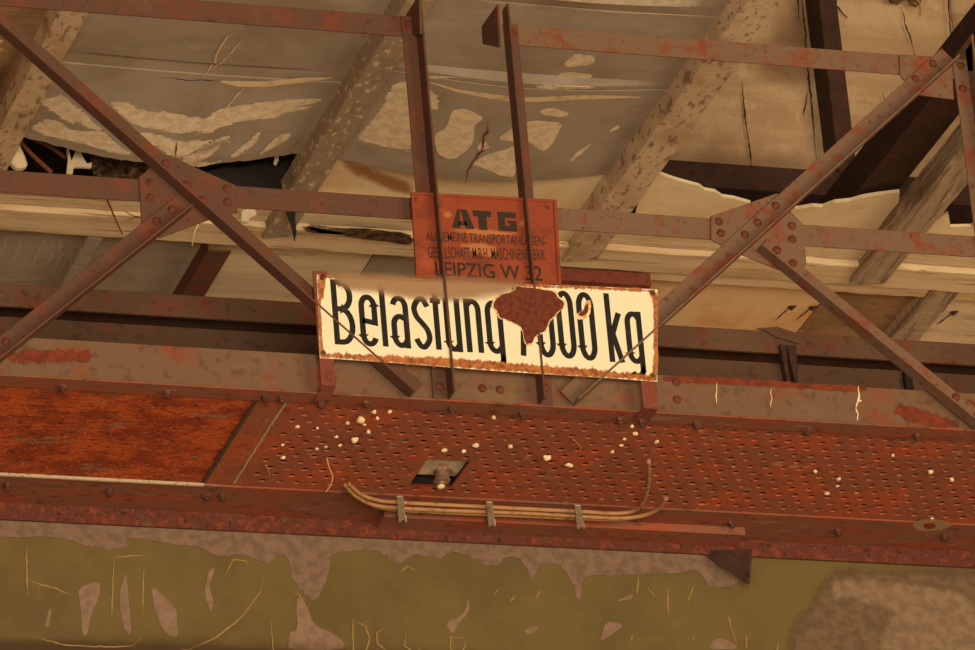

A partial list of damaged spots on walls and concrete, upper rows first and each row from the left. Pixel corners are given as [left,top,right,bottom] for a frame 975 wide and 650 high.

peeling [32,94,134,175]
peeling [111,98,322,167]
peeling [358,80,412,152]
peeling [430,91,440,110]
peeling [434,108,516,177]
crack [466,122,491,181]
peeling [527,108,569,151]
peeling [536,54,595,90]
corrosion [10,349,91,363]
corrosion [894,403,959,428]
peeling [0,520,739,650]
damp [831,579,975,650]